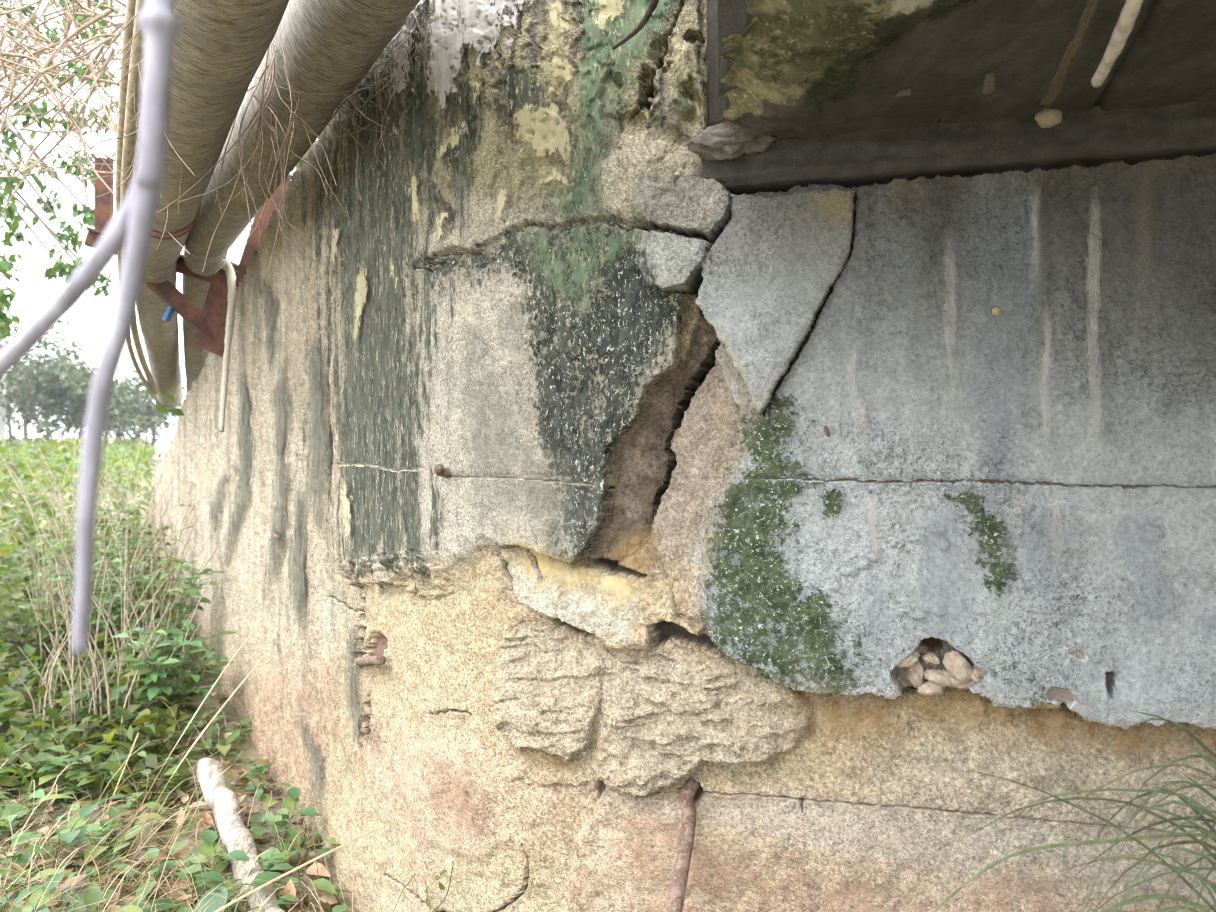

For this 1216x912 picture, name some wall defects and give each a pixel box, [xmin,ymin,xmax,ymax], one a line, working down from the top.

peeling [386,0,533,158]
flaking render [513,1,574,186]
water stain [719,0,977,123]
water stain [209,373,253,566]
water stain [259,0,684,626]
flaking render [500,120,855,662]
crack [651,341,721,522]
crack [761,193,859,417]
water stain [819,489,843,520]
crack [761,475,1216,490]
spalling [891,637,984,697]
crack [493,844,530,912]